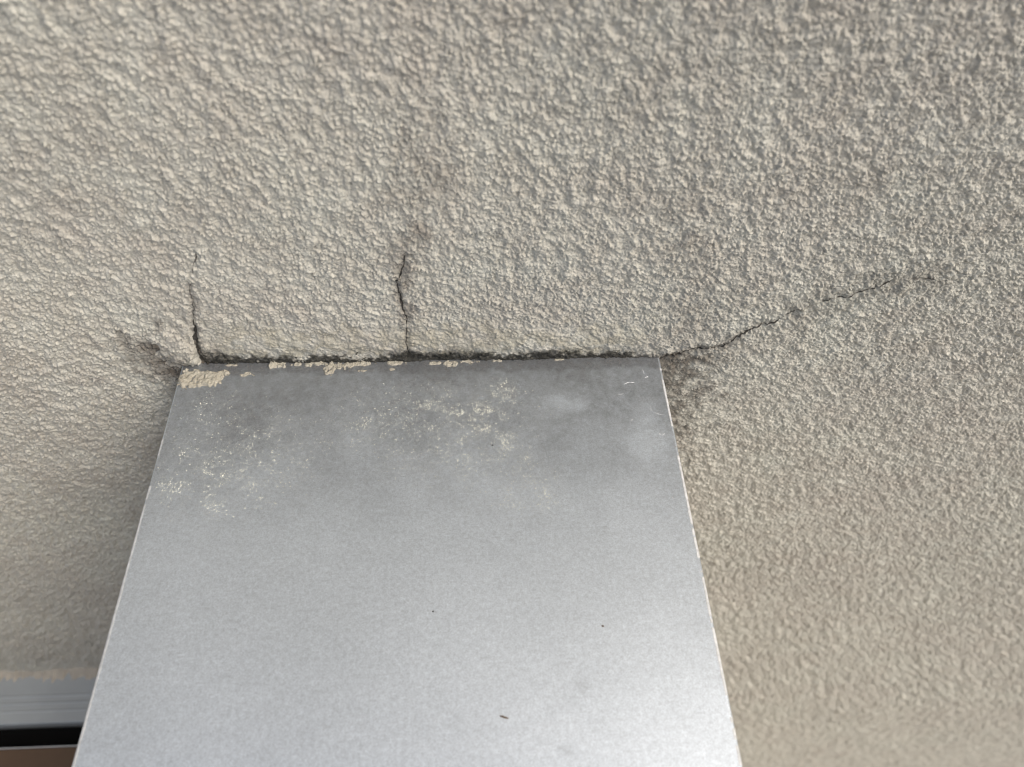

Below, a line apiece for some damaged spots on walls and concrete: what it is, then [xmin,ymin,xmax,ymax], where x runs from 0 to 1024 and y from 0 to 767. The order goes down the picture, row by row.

crack [189,253,203,360]
crack [395,256,410,357]
crack [660,277,935,359]